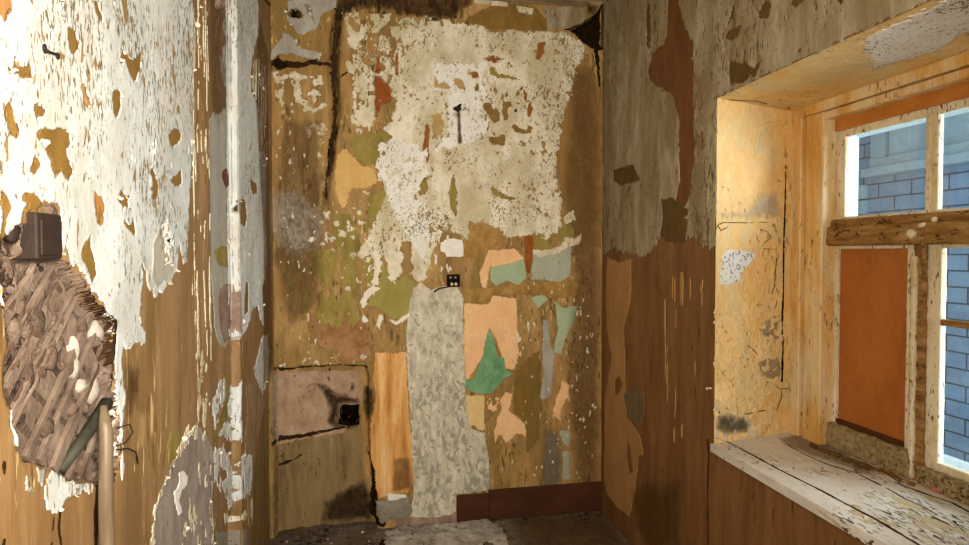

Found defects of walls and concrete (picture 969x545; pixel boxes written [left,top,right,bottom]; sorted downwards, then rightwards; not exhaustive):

crack [271,5,348,210]
peeling [0,0,370,545]
peeling [271,0,969,545]
crack [715,165,789,415]
leakage [718,416,747,433]